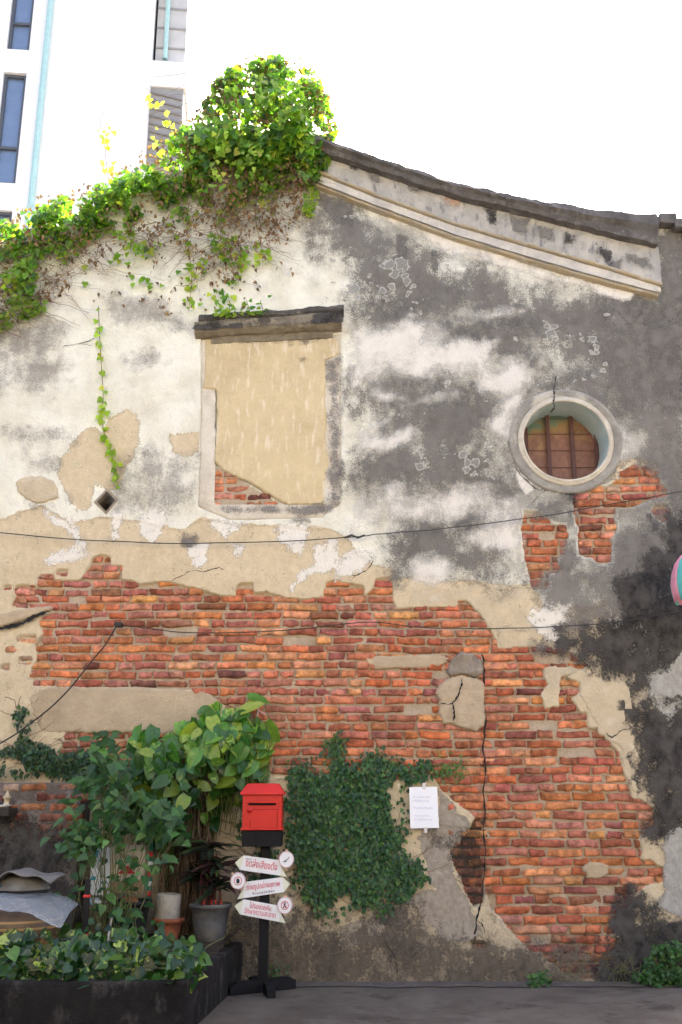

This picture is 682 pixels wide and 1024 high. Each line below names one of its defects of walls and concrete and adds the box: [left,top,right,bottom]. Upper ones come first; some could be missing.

leakage [0,322,62,390]
leakage [112,191,682,845]
spalling [0,409,671,979]
leakage [225,865,682,982]
crack [441,655,487,942]